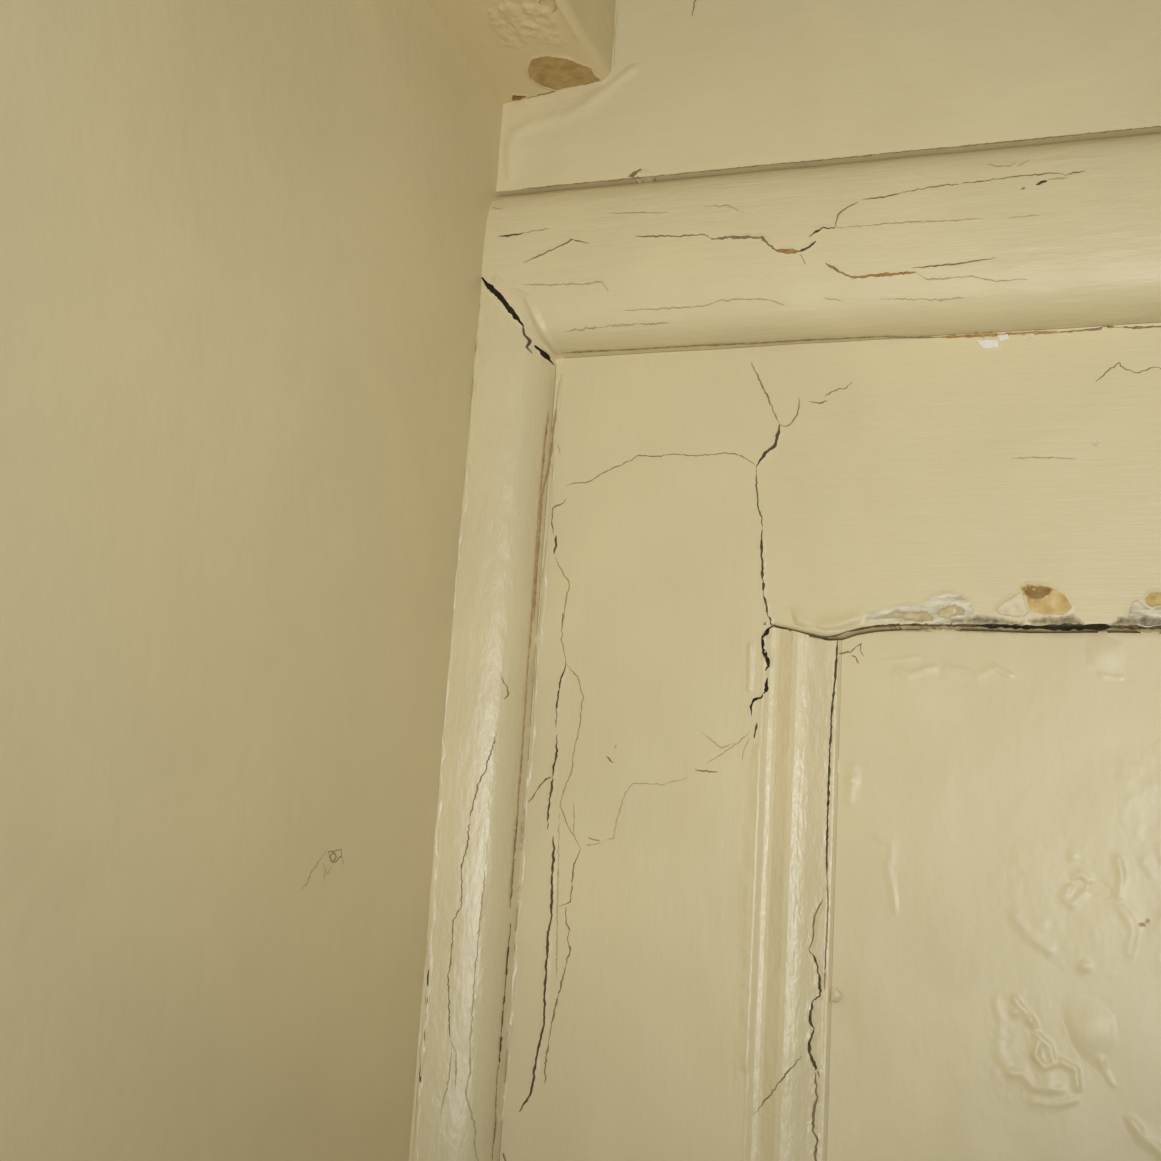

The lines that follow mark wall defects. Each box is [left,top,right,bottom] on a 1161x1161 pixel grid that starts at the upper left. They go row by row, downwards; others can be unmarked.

peeling [509,54,603,102]
crack [526,126,1161,302]
peeling [864,581,1080,633]
peeling [1115,588,1161,634]
crack [419,207,1161,1161]